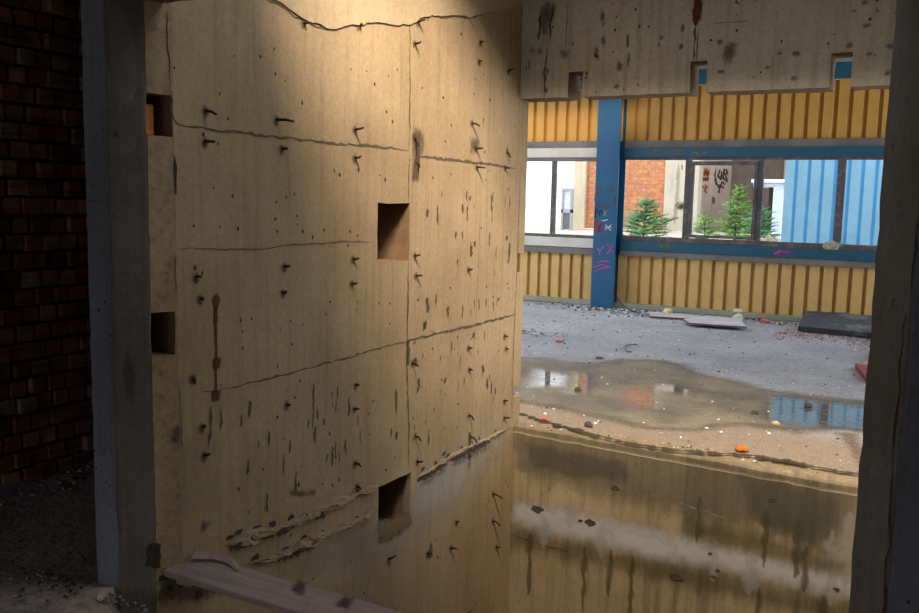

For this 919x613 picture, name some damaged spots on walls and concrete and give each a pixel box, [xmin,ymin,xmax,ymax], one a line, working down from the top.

rust [692,0,702,26]
rust [198,294,223,460]
spalling [145,543,281,613]
spalling [225,521,276,541]
spalling [233,423,858,613]
water stain [514,497,851,613]